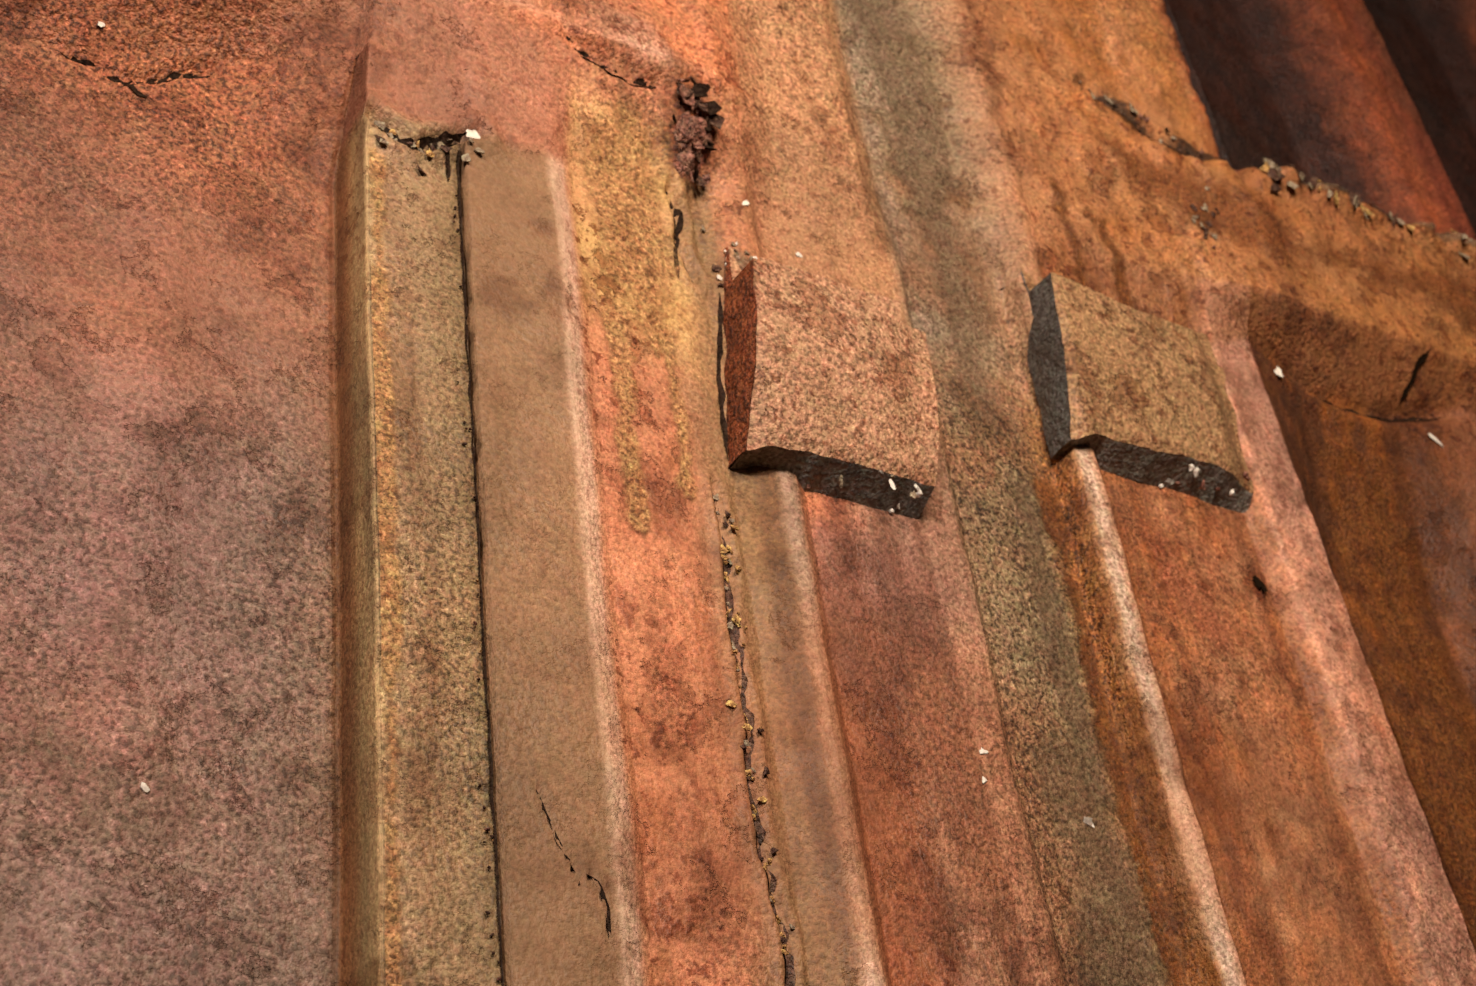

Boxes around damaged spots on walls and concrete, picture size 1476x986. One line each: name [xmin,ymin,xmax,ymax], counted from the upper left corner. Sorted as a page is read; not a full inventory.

crack [61,52,208,98]
peeling [465,129,480,139]
crack [536,790,611,936]